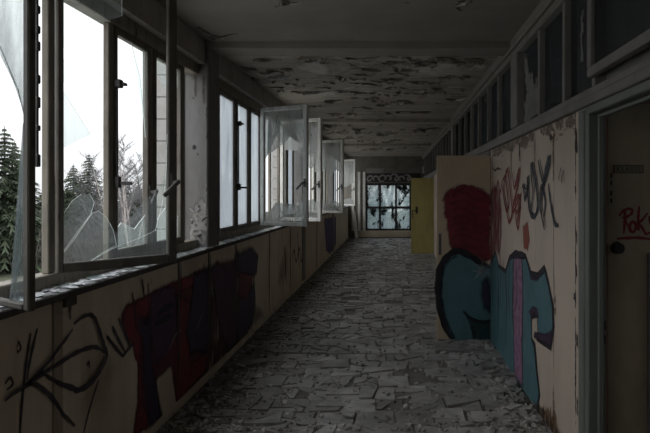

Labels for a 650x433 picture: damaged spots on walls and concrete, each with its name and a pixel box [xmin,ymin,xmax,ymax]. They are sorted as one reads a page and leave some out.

peeling [237,56,485,152]
peeling [189,198,207,245]